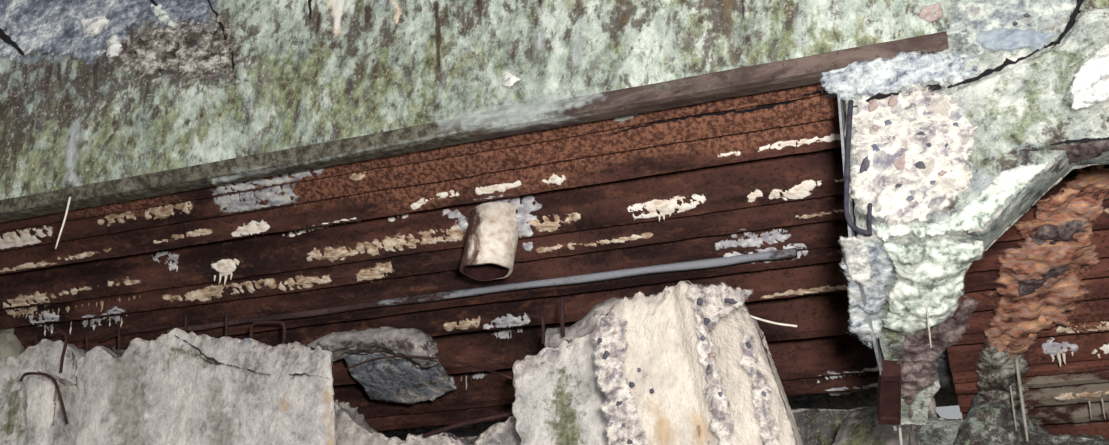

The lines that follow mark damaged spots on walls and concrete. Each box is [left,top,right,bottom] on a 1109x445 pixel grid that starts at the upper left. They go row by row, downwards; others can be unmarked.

crack [0,28,24,55]
leakage [313,0,345,36]
crack [614,0,1084,134]
leakage [212,168,324,237]
leakage [542,174,566,185]
leakage [759,134,841,151]
spalling [822,0,1081,427]
corrosion [984,138,1109,358]
crack [175,335,327,379]
spalling [592,312,648,445]
spalling [686,283,752,445]
spalling [739,326,781,445]